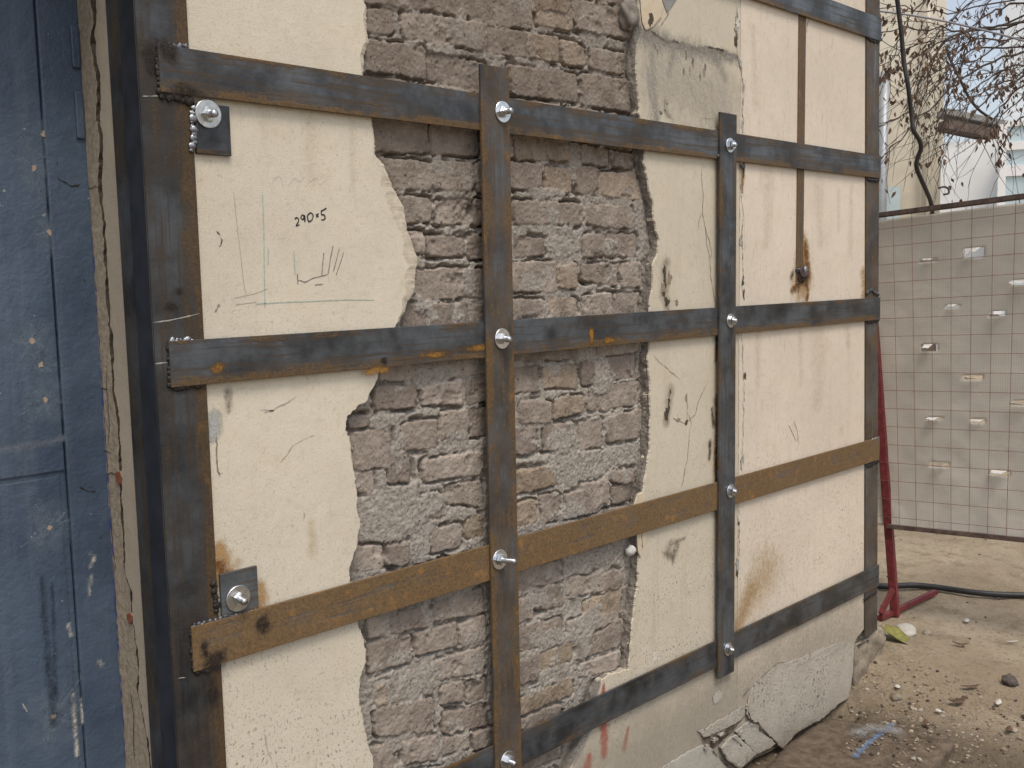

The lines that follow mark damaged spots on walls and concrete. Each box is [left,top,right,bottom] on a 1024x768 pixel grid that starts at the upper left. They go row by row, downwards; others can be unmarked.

flaking render [360,0,669,119]
flaking render [371,118,484,327]
flaking render [510,134,678,320]
crack [698,165,716,305]
rust [791,235,811,301]
flaking render [345,358,489,583]
flaking render [514,342,651,537]
crack [674,386,706,488]
rust [215,541,233,590]
flaking render [357,580,493,768]
flaking render [518,532,647,731]
peeling [660,640,855,768]